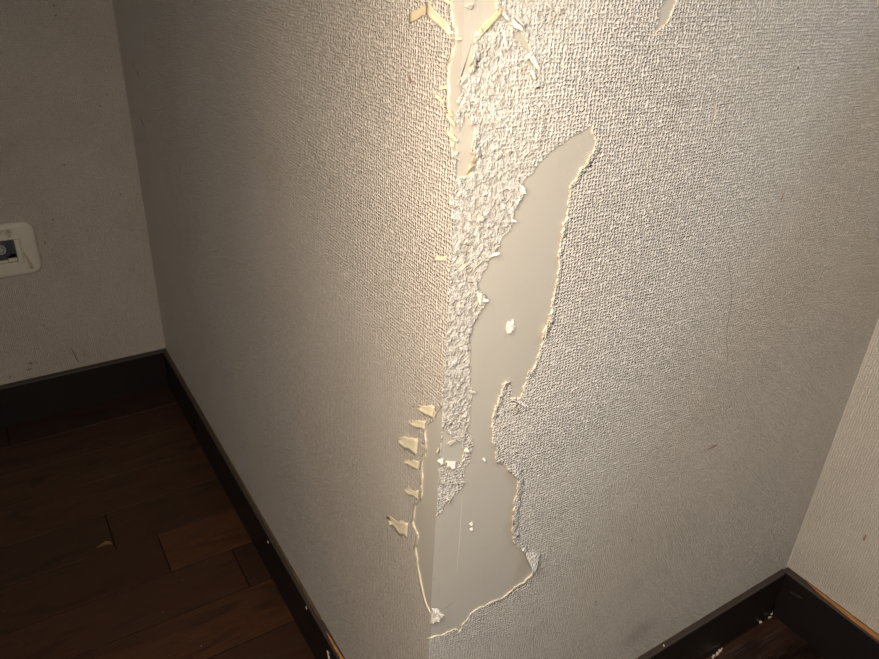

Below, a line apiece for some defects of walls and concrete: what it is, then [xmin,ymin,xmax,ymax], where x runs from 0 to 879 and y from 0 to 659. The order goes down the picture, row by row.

peeling [409,2,463,41]
spalling [481,9,545,91]
peeling [397,405,436,470]
peeling [436,447,470,500]
peeling [386,516,408,539]